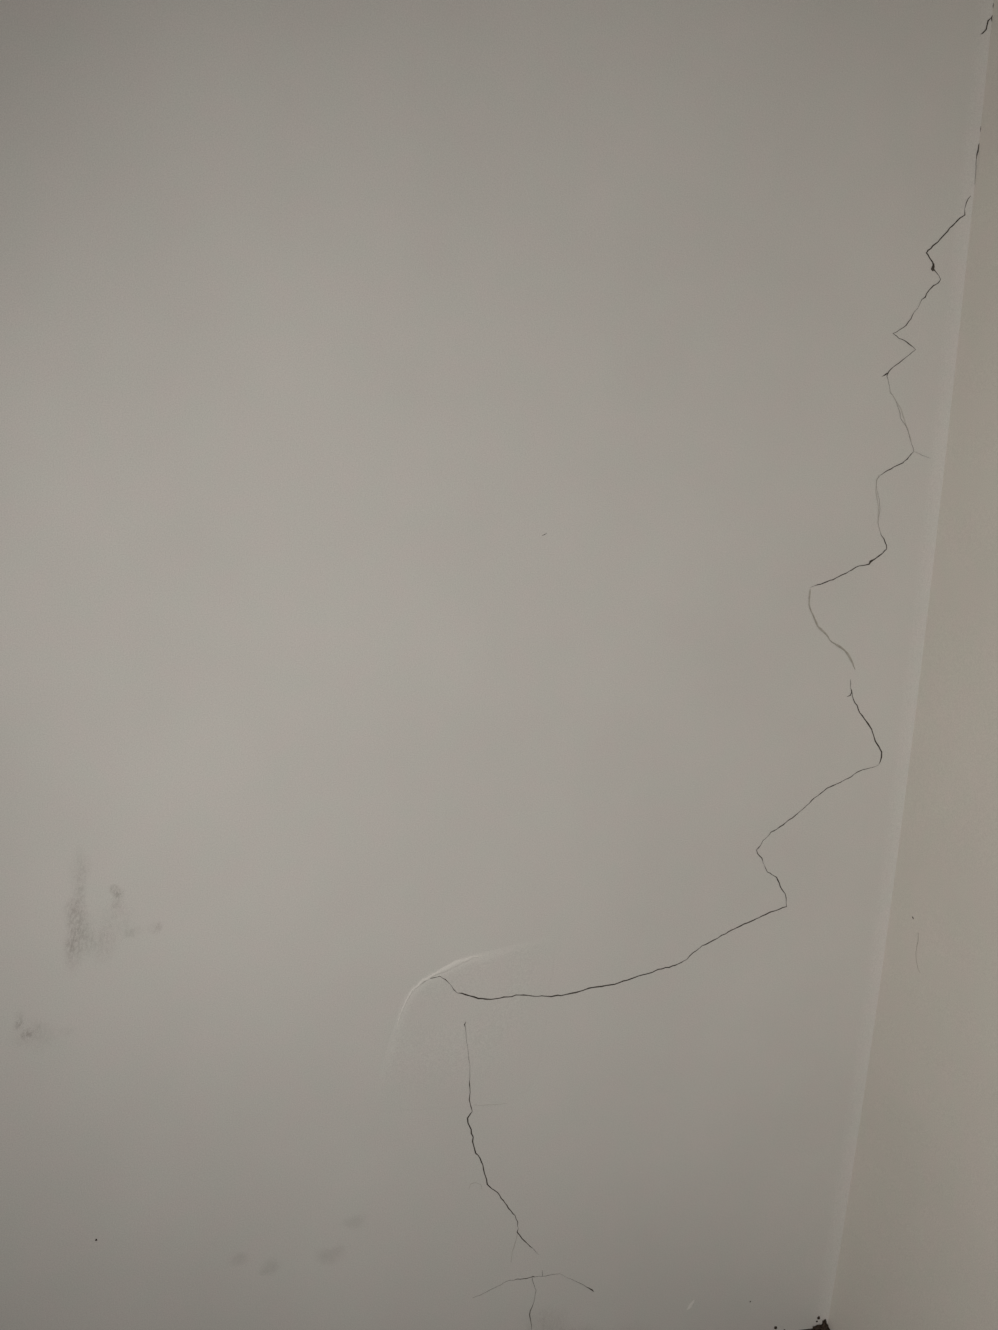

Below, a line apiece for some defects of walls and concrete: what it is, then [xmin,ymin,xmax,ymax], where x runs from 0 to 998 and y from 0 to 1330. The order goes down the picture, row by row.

crack [430,128,981,1329]